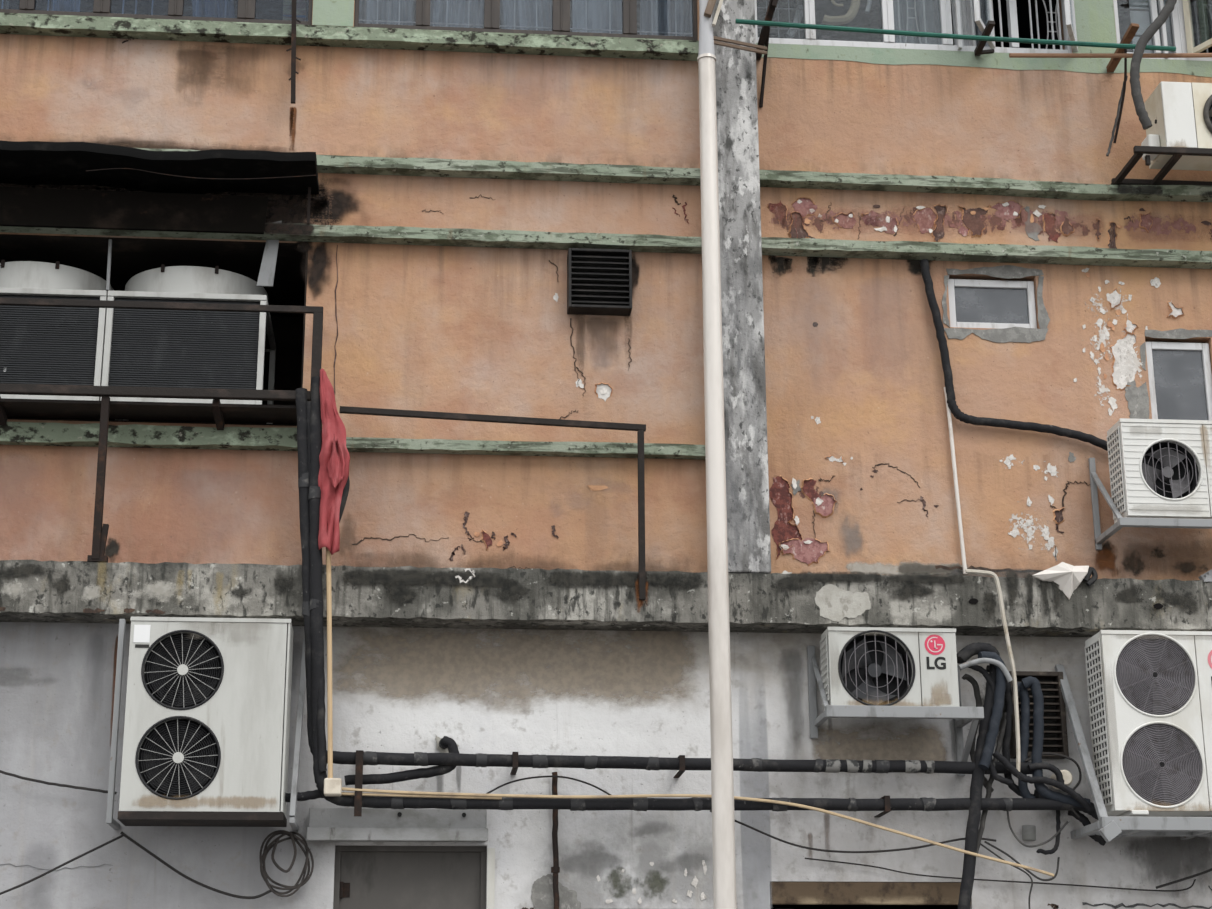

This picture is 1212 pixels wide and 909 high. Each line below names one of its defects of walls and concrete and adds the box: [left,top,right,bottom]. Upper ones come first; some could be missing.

peeling [767,197,1212,249]
crack [560,318,586,419]
peeling [1082,268,1148,419]
crack [352,534,446,545]
peeling [769,475,837,566]
crack [860,463,939,517]
crack [1050,481,1089,533]
water stain [342,568,529,606]
water stain [548,571,704,588]
water stain [776,562,965,599]
water stain [336,629,693,705]
peeling [531,874,581,909]